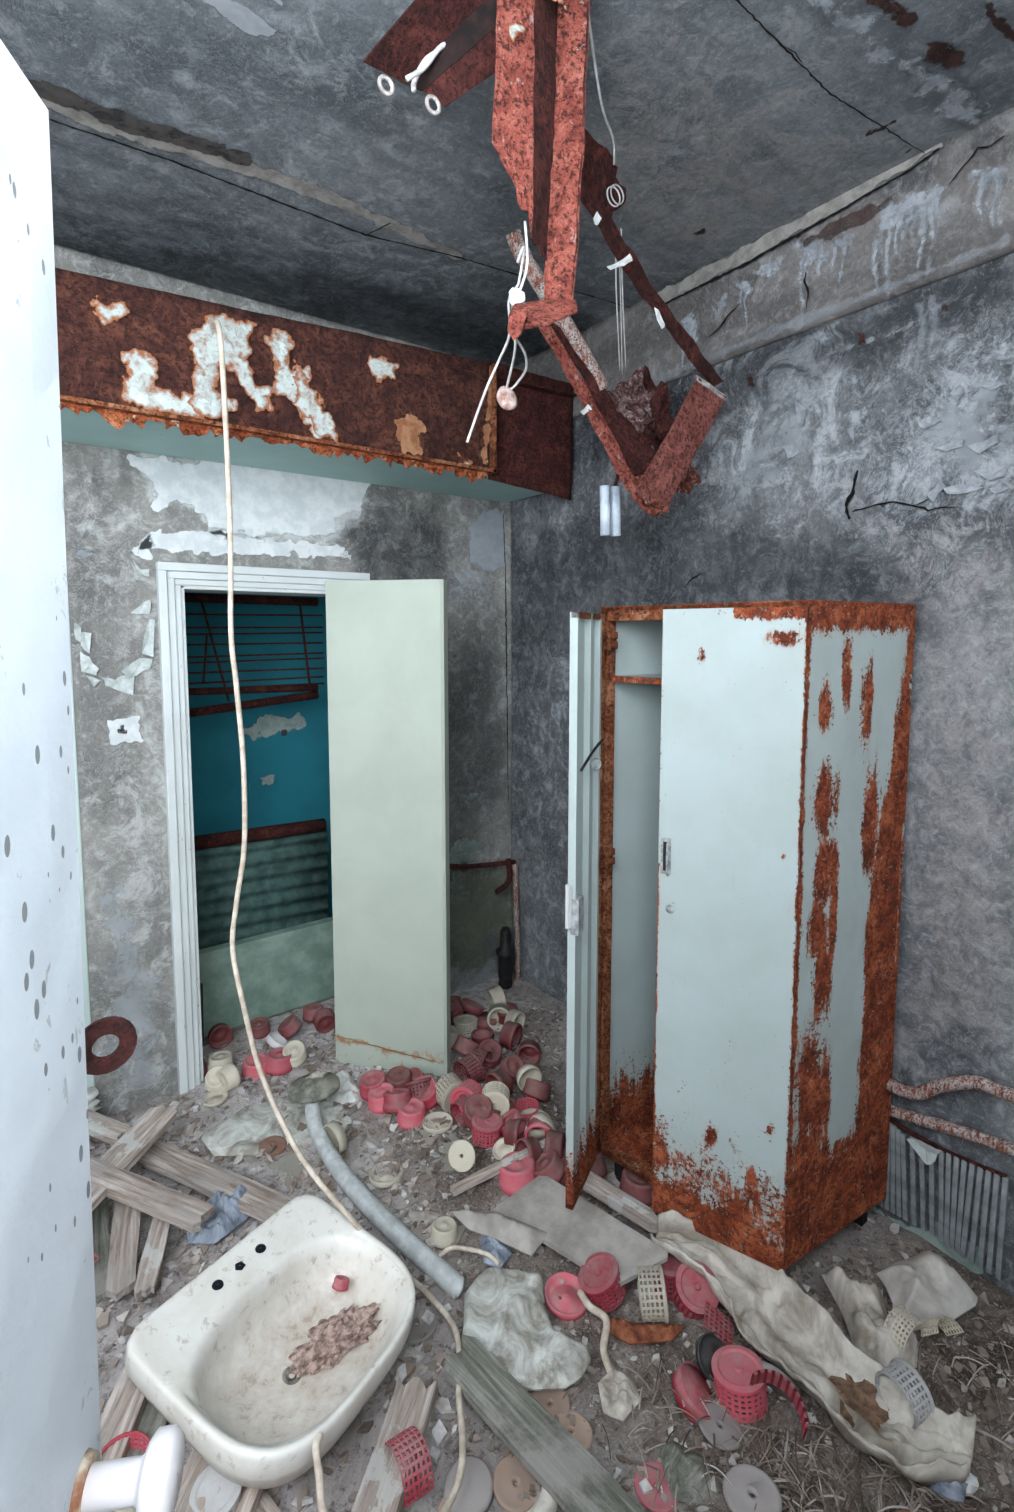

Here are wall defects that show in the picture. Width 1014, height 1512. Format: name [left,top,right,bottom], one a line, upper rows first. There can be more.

peeling [198,0,281,38]
crack [574,0,1004,338]
damp [972,168,1008,224]
efflorescence [871,185,945,291]
efflorescence [679,231,851,384]
corrosion [60,401,488,483]
peeling [126,454,371,577]
crack [845,470,954,520]
peeling [74,600,155,695]
peeling [107,716,144,745]
peeling [244,712,306,741]
peeling [261,775,275,785]